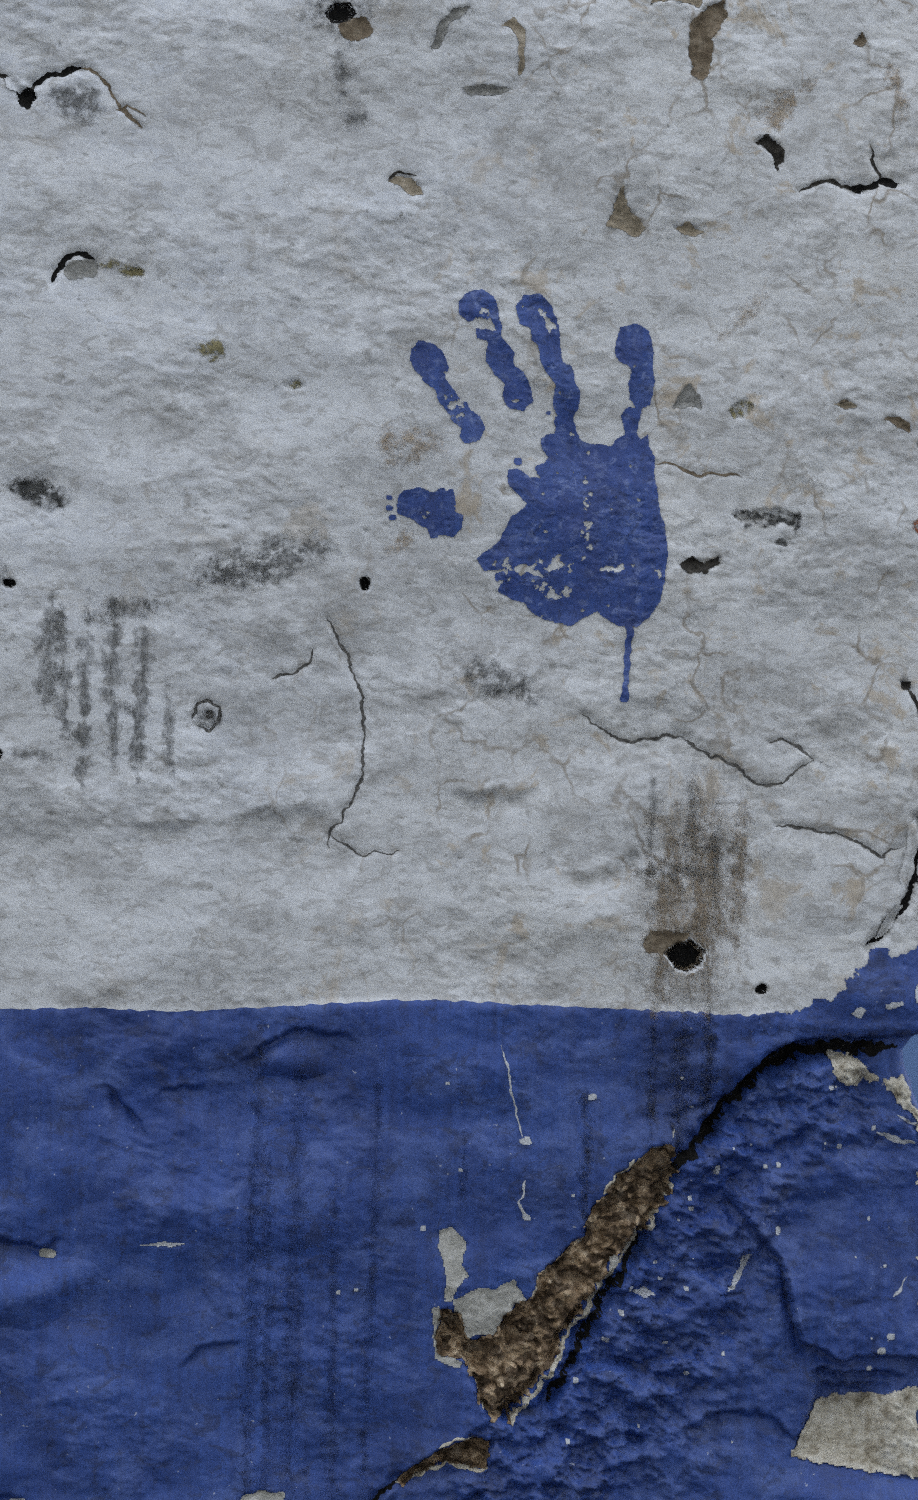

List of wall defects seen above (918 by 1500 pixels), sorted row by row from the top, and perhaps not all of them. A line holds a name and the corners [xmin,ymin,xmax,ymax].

spalling [651,0,728,81]
leakage [36,596,157,780]
crack [272,619,399,857]
crack [582,714,814,787]
crack [901,681,918,712]
crack [776,824,898,858]
spalling [826,1049,918,1144]
spalling [432,1129,679,1426]
spalling [395,1437,490,1487]
spalling [791,1386,918,1479]